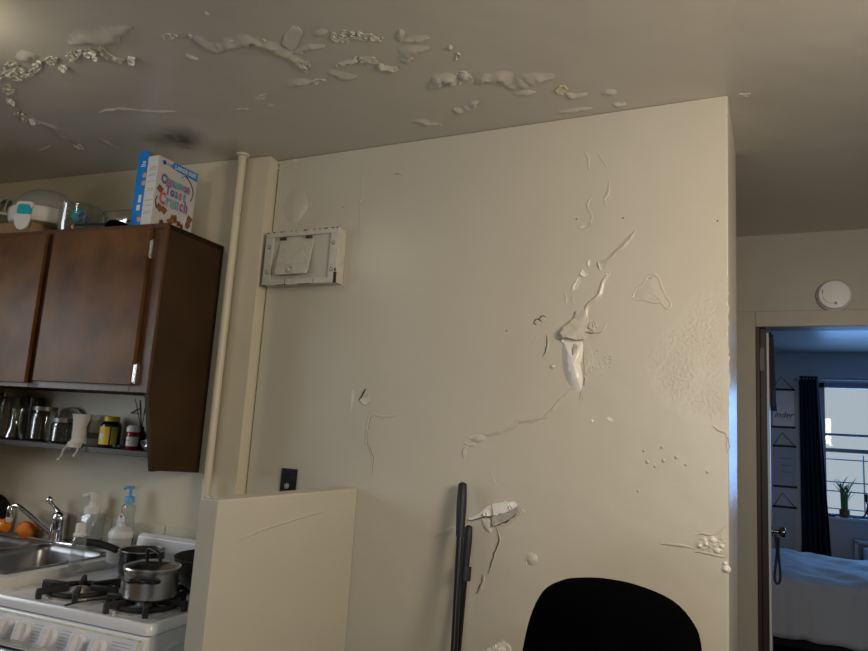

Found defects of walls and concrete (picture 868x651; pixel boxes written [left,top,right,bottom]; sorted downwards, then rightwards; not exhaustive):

peeling [1,24,133,125]
crack [532,334,549,358]
spalling [468,501,525,595]